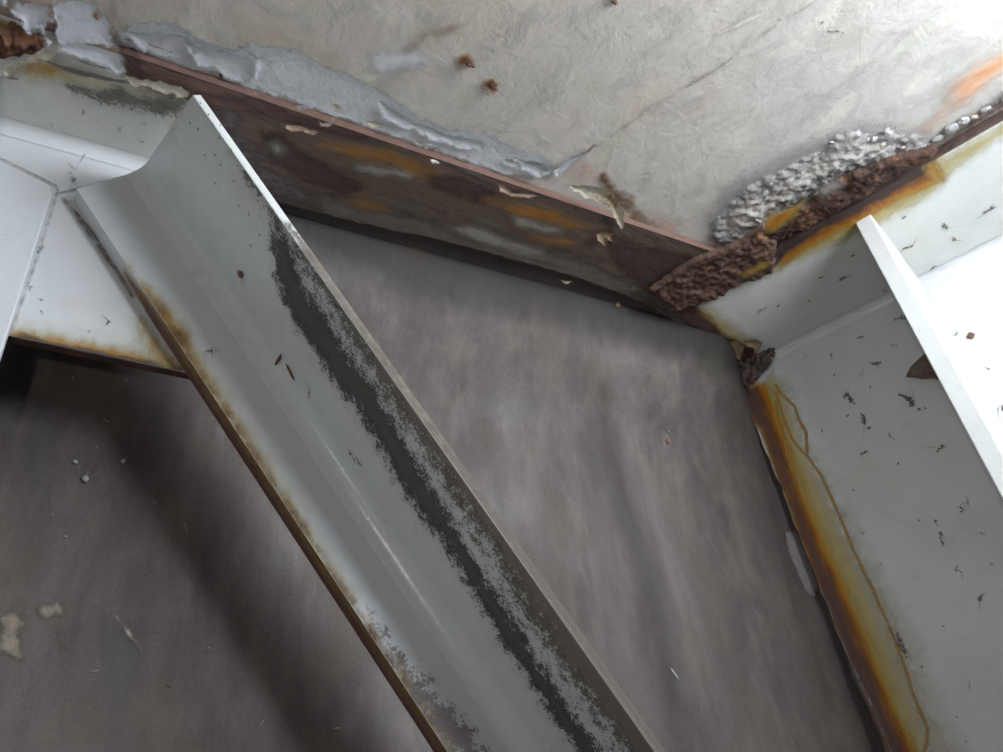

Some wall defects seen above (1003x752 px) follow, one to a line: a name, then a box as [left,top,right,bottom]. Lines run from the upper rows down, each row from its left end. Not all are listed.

peeling [0,0,587,198]
corrosion [121,46,756,361]
peeling [568,185,624,245]
corrosion [745,104,1003,275]
corrosion [7,274,447,752]
damp [240,169,747,752]
corrosion [747,377,944,752]